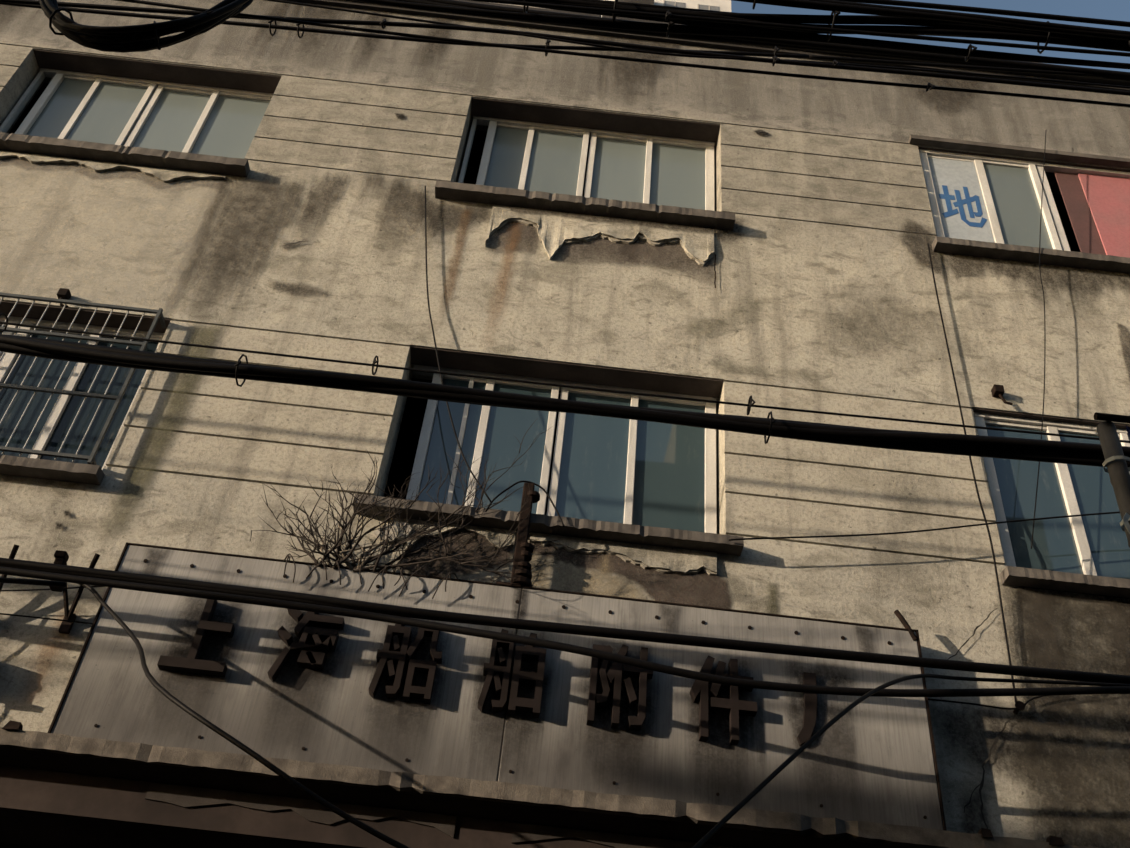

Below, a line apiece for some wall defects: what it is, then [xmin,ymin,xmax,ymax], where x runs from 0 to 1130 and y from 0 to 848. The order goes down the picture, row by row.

water stain [258,3,338,44]
water stain [365,10,388,46]
water stain [427,17,449,53]
water stain [599,36,679,83]
flaking render [0,151,226,189]
water stain [187,177,343,291]
flaking render [485,206,716,288]
water stain [903,223,1130,294]
flaking render [373,519,731,609]
crack [964,712,1016,829]